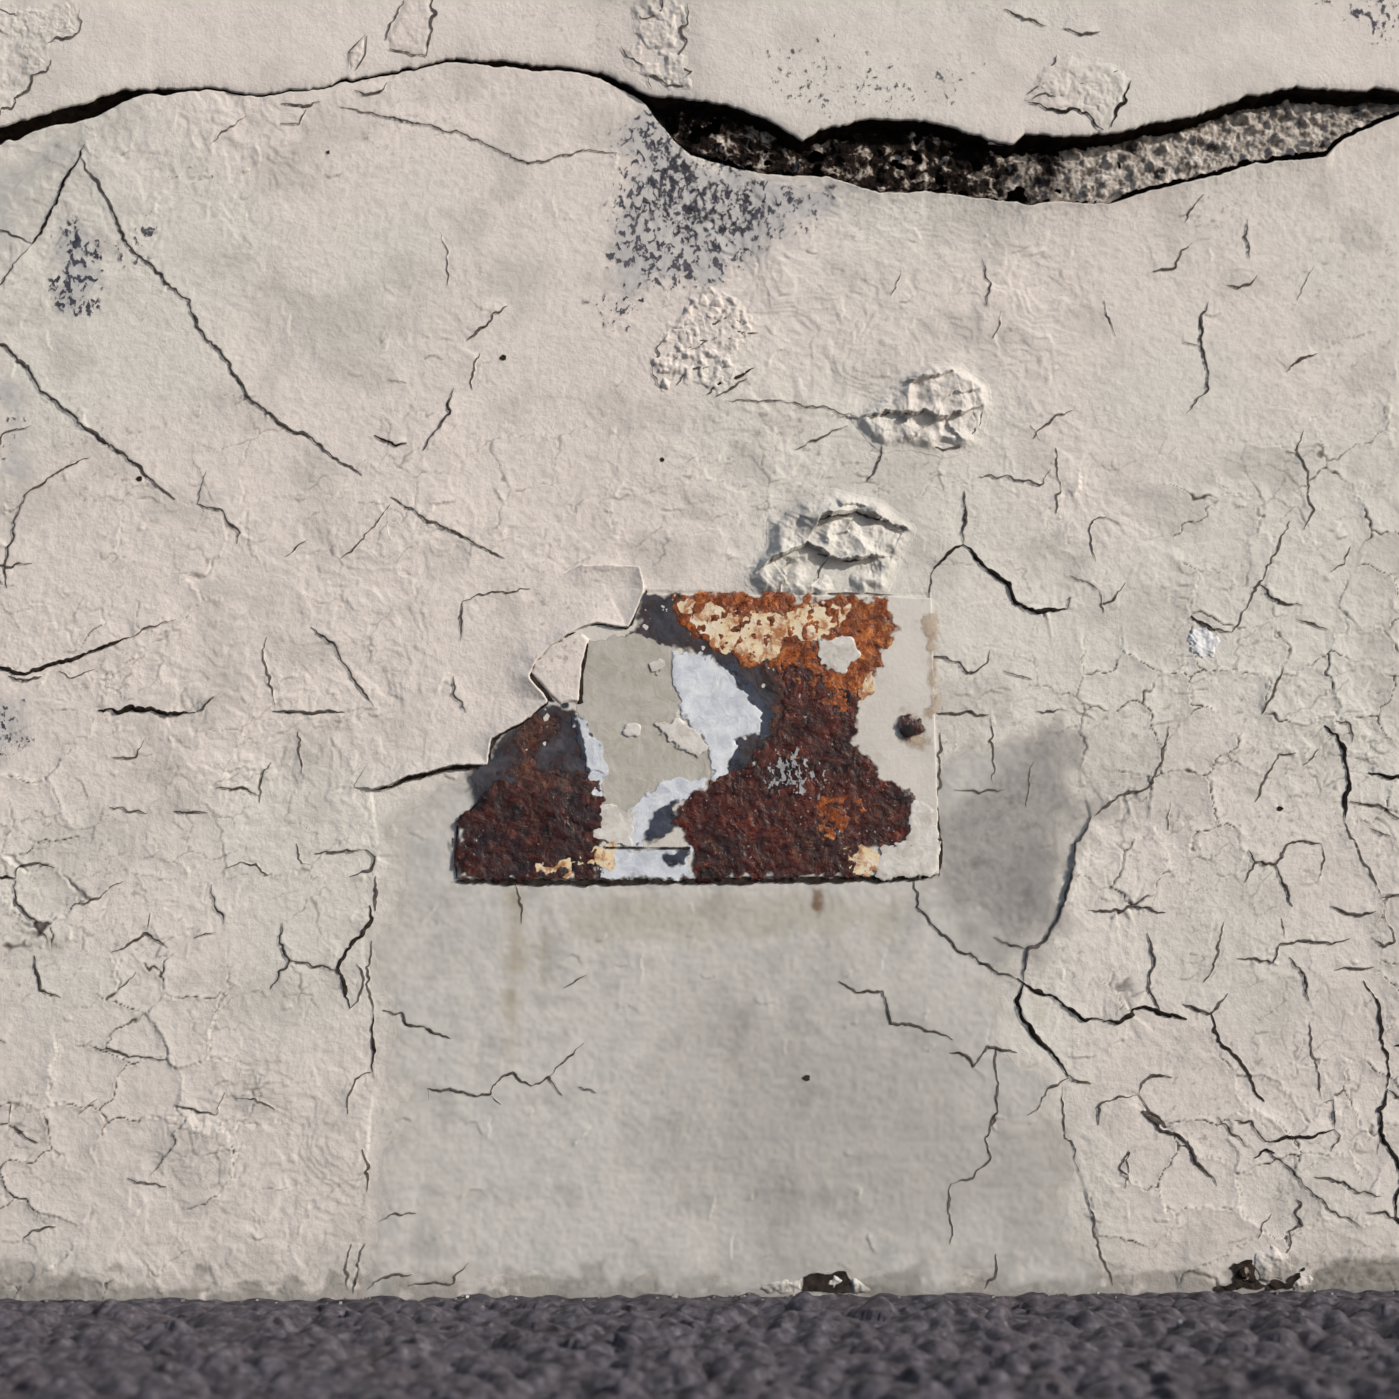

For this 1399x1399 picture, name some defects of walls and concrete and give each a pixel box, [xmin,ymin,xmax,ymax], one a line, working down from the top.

peeling [1344,0,1399,44]
peeling [338,82,852,415]
crack [0,59,1399,475]
crack [0,343,241,588]
crack [929,491,1126,623]
crack [109,627,374,814]
crack [270,876,451,1114]
rust [452,713,612,883]
peeling [354,565,1092,1295]
rust [670,590,916,910]
leakage [946,728,1073,933]
crack [838,710,1399,1288]